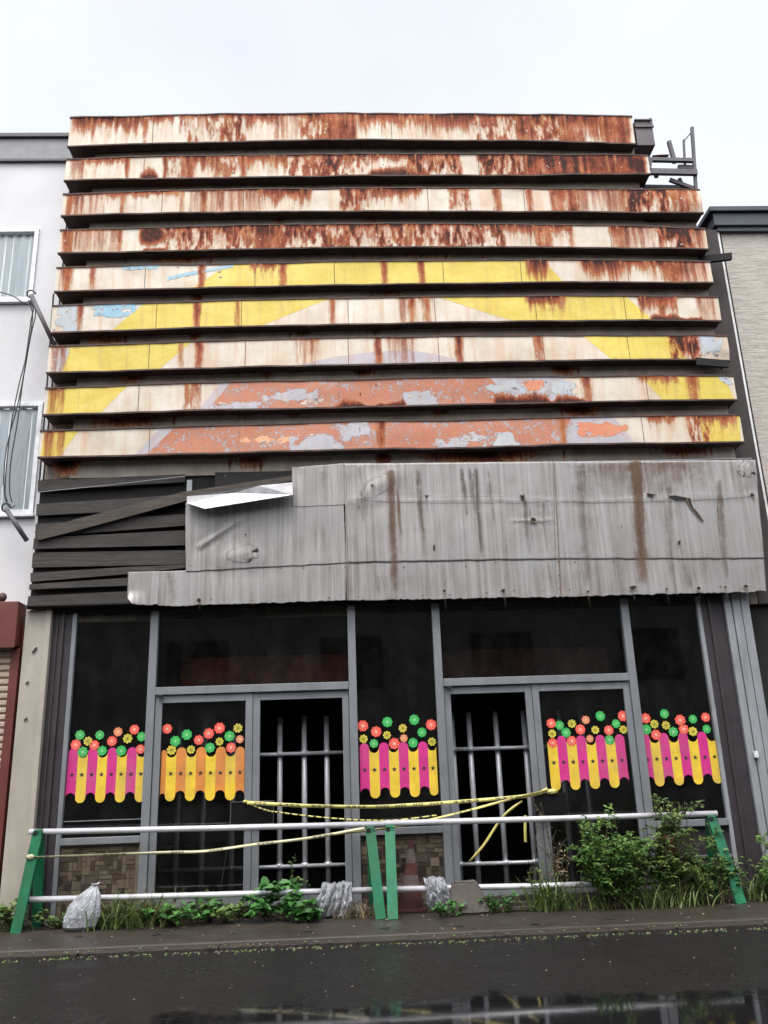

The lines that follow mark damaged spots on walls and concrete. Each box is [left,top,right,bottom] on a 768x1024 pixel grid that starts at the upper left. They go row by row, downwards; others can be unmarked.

corrosion [548,189,699,212]
corrosion [60,114,647,368]
corrosion [608,226,703,248]
corrosion [580,260,707,282]
corrosion [637,296,716,320]
peeling [401,390,439,405]
peeling [486,379,577,398]
peeling [431,431,520,448]
peeling [570,422,628,437]